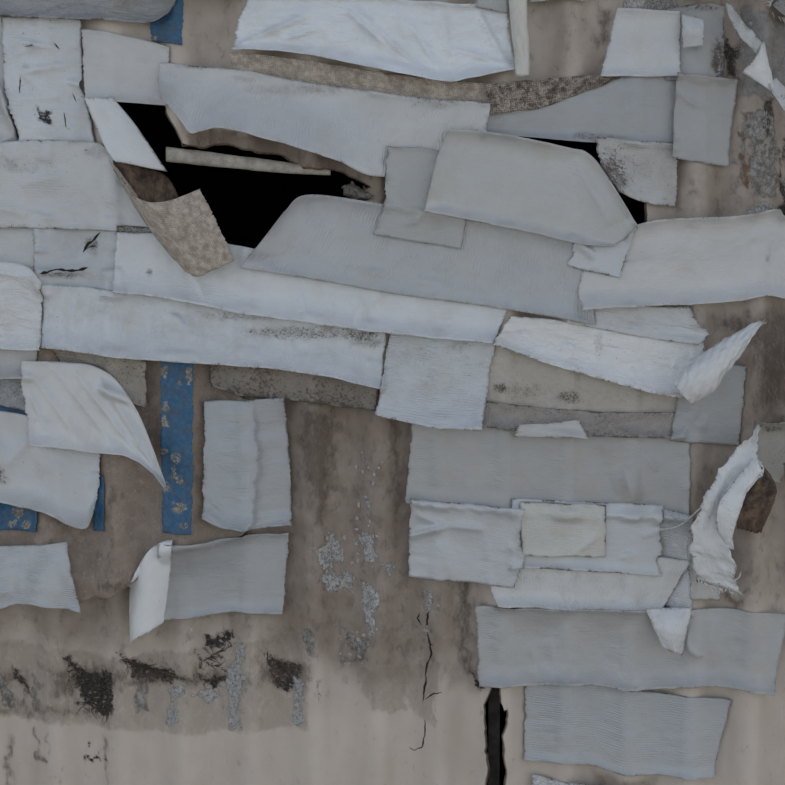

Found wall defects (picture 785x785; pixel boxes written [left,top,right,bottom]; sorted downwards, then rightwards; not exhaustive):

damp [724,39,740,78]
damp [763,99,773,135]
crack [417,611,441,700]